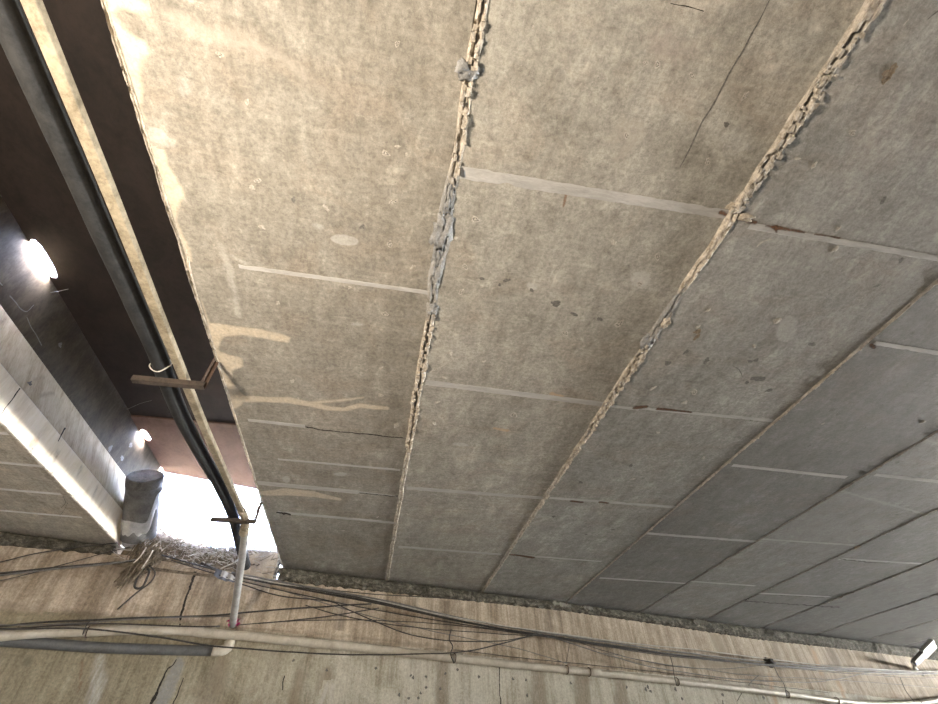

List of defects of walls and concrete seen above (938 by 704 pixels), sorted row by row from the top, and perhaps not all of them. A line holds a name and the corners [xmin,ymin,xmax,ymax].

crack [680,0,770,167]
water stain [200,239,391,414]
crack [306,427,403,438]